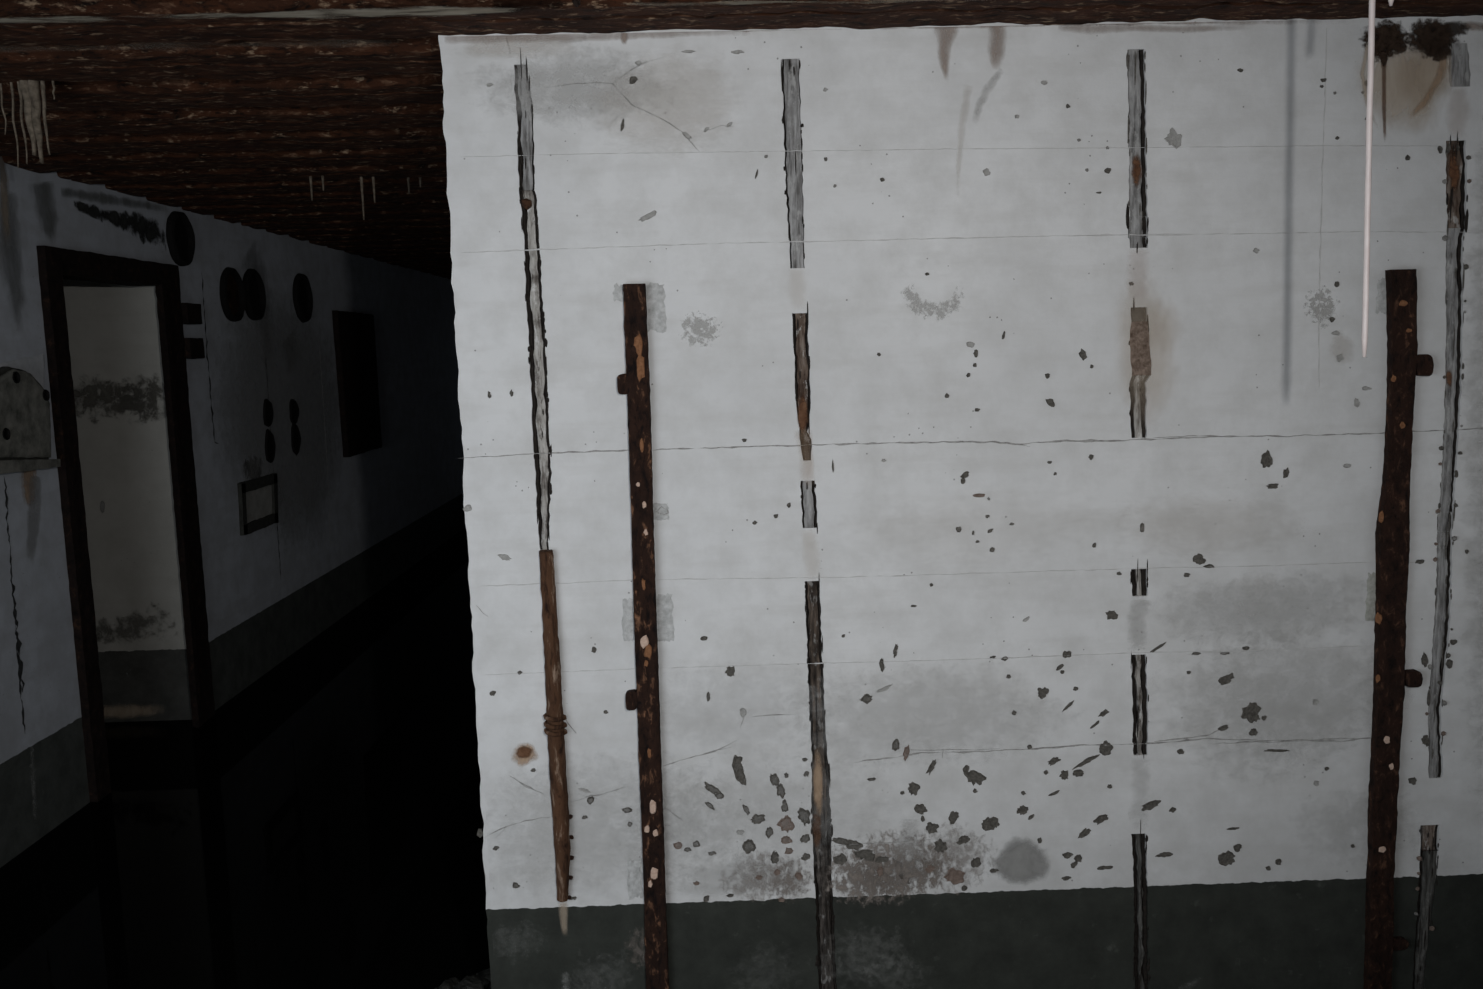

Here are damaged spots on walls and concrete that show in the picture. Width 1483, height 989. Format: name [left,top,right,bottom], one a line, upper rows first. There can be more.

mould [1362,19,1470,66]
spalling [514,49,537,229]
corrosion [634,334,645,382]
spalling [528,313,552,459]
spalling [956,471,1014,552]
corrosion [640,635,652,667]
spalling [1421,635,1457,759]
spalling [1218,702,1290,752]
corrosion [516,745,535,764]
corrosion [644,800,658,836]
spalling [1140,800,1176,857]
corrosion [648,867,658,888]